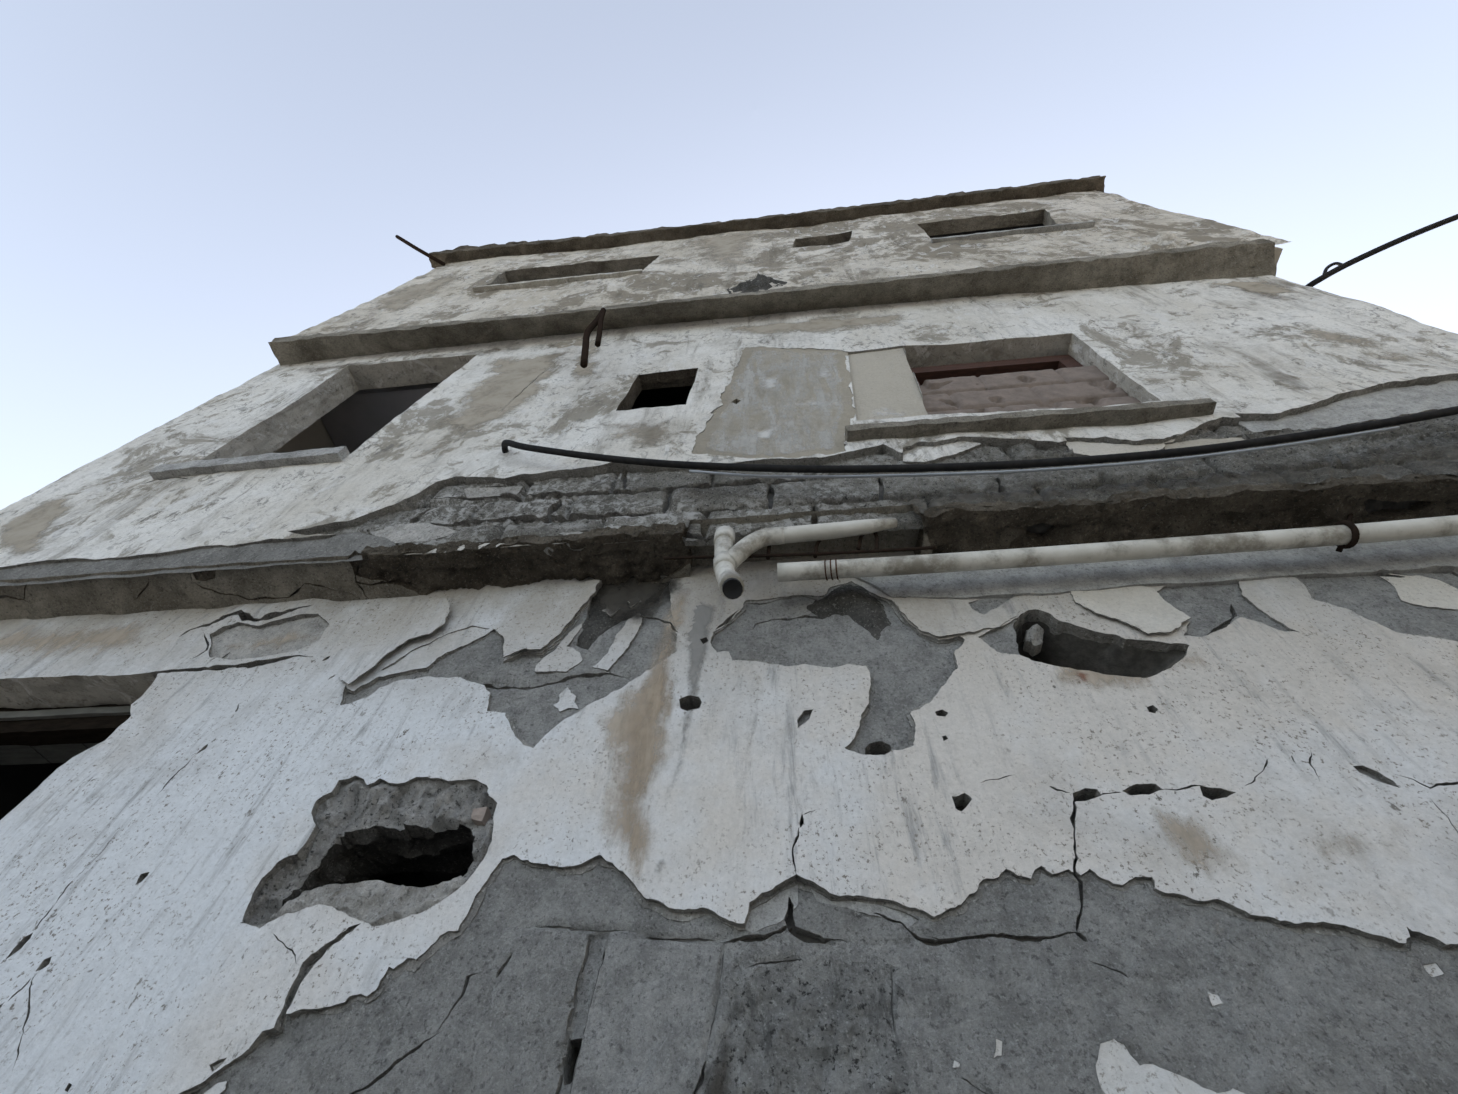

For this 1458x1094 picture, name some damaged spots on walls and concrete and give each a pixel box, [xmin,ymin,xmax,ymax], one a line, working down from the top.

peeling [310,346,1458,755]
peeling [186,857,1458,1094]
crack [915,935,1042,946]
crack [1073,860,1084,941]